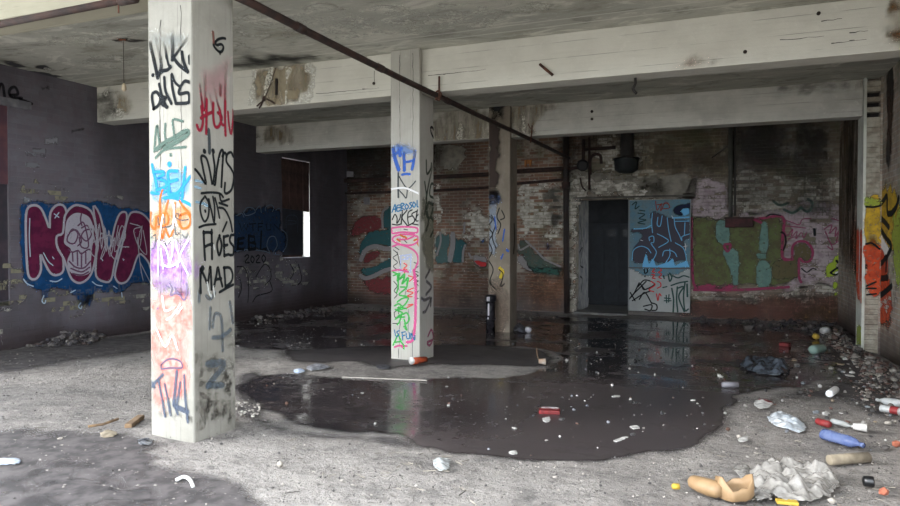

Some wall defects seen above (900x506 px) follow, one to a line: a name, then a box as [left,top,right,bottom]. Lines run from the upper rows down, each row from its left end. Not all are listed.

peeling [433,184,443,251]
peeling [462,210,489,241]